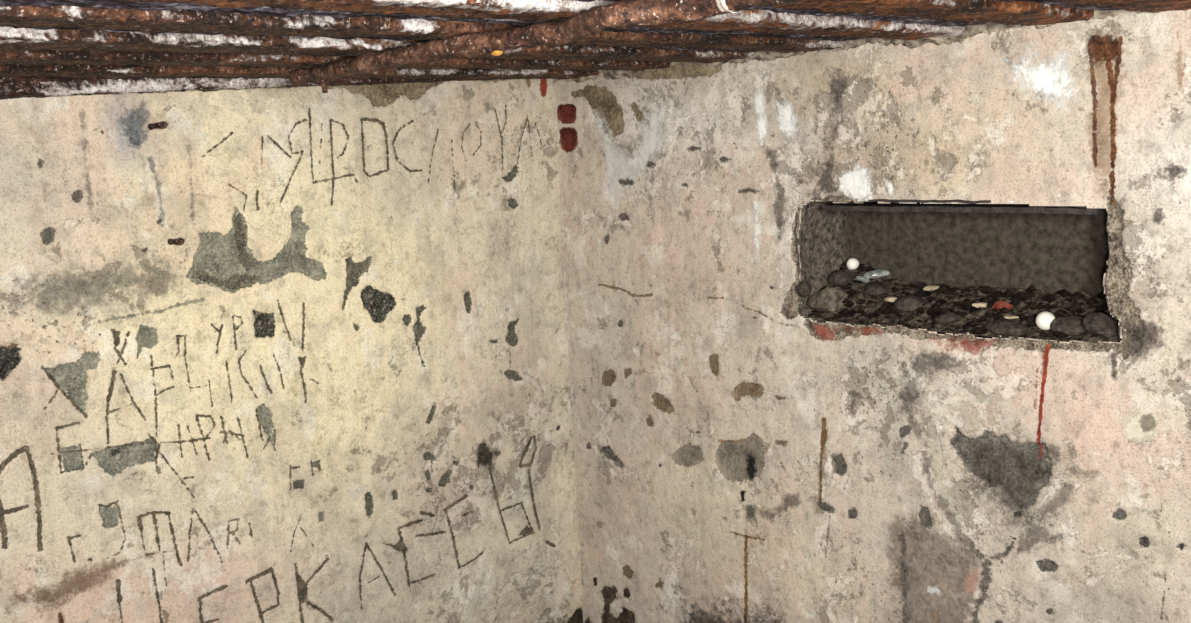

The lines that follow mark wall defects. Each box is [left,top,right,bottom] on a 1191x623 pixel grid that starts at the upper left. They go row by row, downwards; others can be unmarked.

rust [1087,35,1123,205]
spalling [71,190,83,203]
peeling [32,205,327,310]
peeling [98,298,204,323]
spalling [253,310,276,338]
spalling [342,256,426,367]
spalling [0,343,22,381]
leakage [568,565,635,623]
leakage [685,601,782,623]
leakage [890,514,992,623]